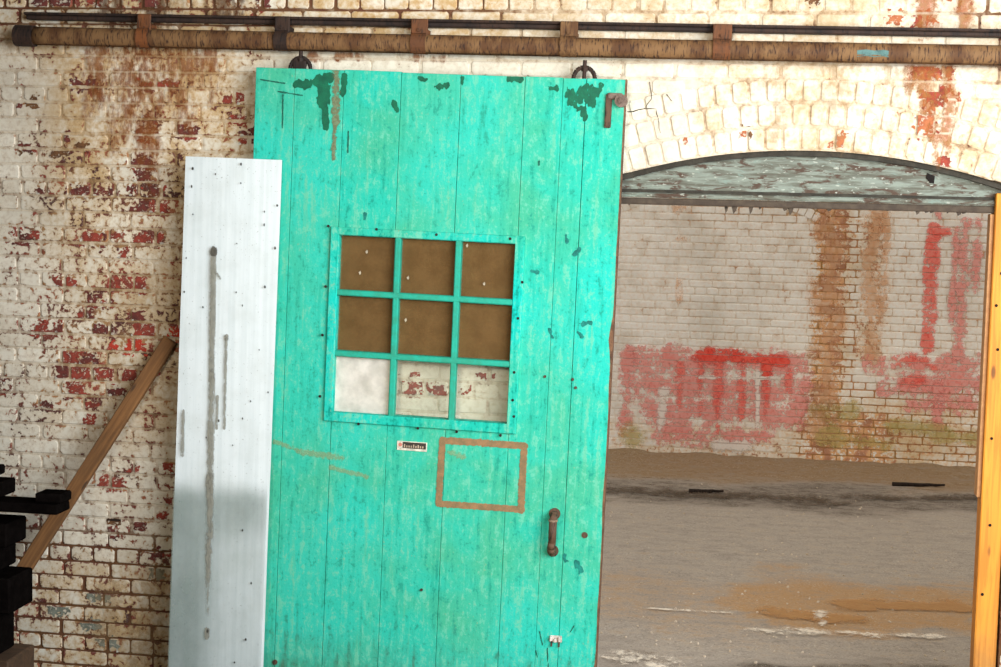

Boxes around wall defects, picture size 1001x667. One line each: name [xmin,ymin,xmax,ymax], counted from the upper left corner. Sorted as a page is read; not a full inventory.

rust [915,0,937,28]
rust [954,0,974,28]
peeling [222,92,254,145]
rust [904,66,959,164]
peeling [46,130,90,160]
peeling [175,124,201,142]
peeling [64,111,171,217]
peeling [10,227,41,249]
peeling [79,231,164,258]
peeling [30,320,63,341]
peeling [40,275,180,429]
spalling [106,518,122,541]